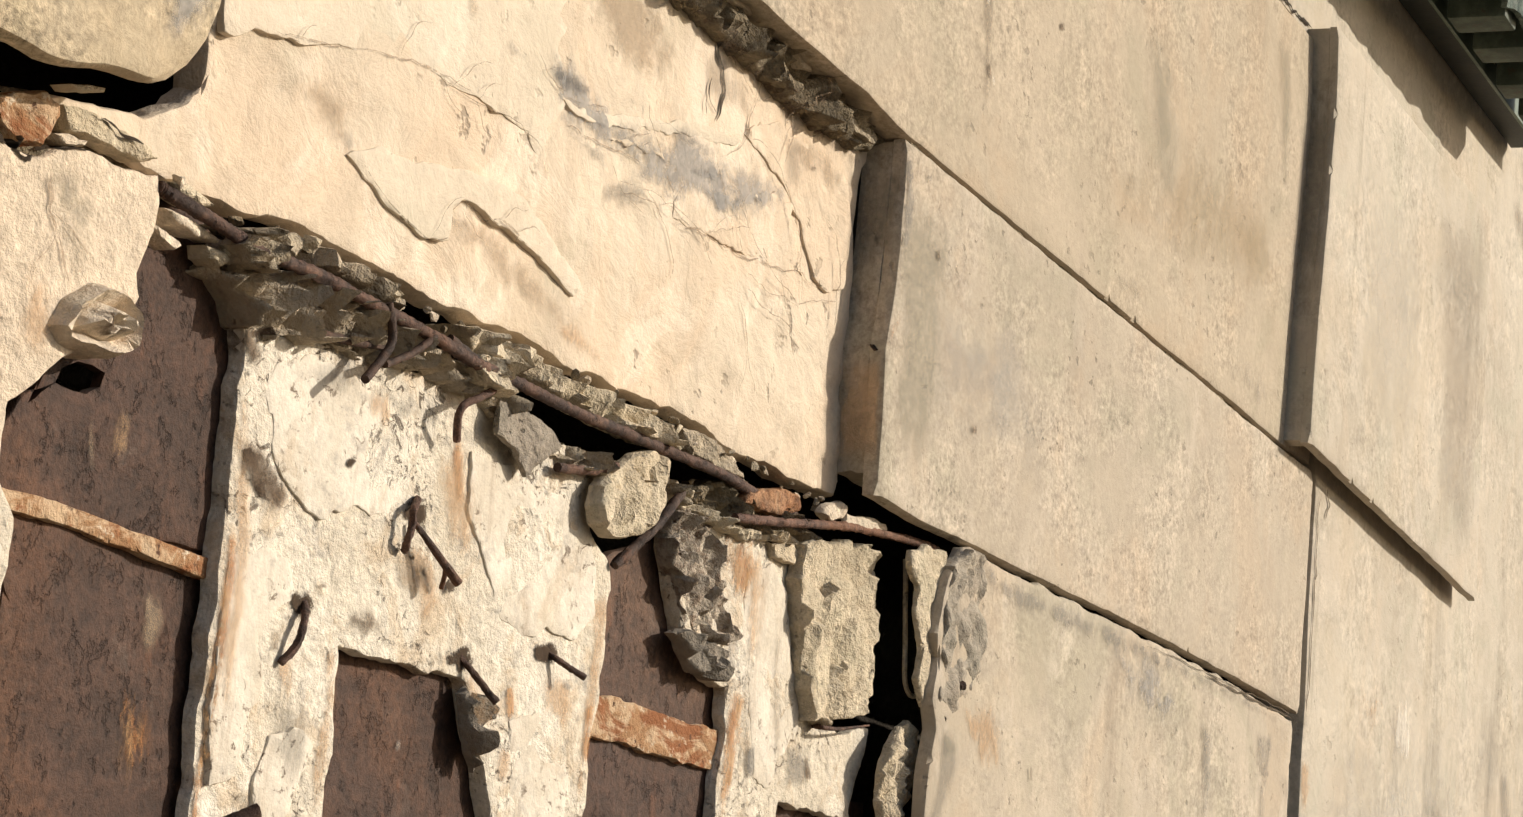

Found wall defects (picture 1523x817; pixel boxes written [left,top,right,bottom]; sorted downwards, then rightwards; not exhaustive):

spalling [0,84,157,173]
crack [290,21,537,141]
crack [369,172,536,242]
peeling [216,0,885,297]
water stain [556,69,771,211]
crack [541,31,844,391]
rust [158,181,758,493]
spalling [148,174,825,817]
rust [732,512,941,550]